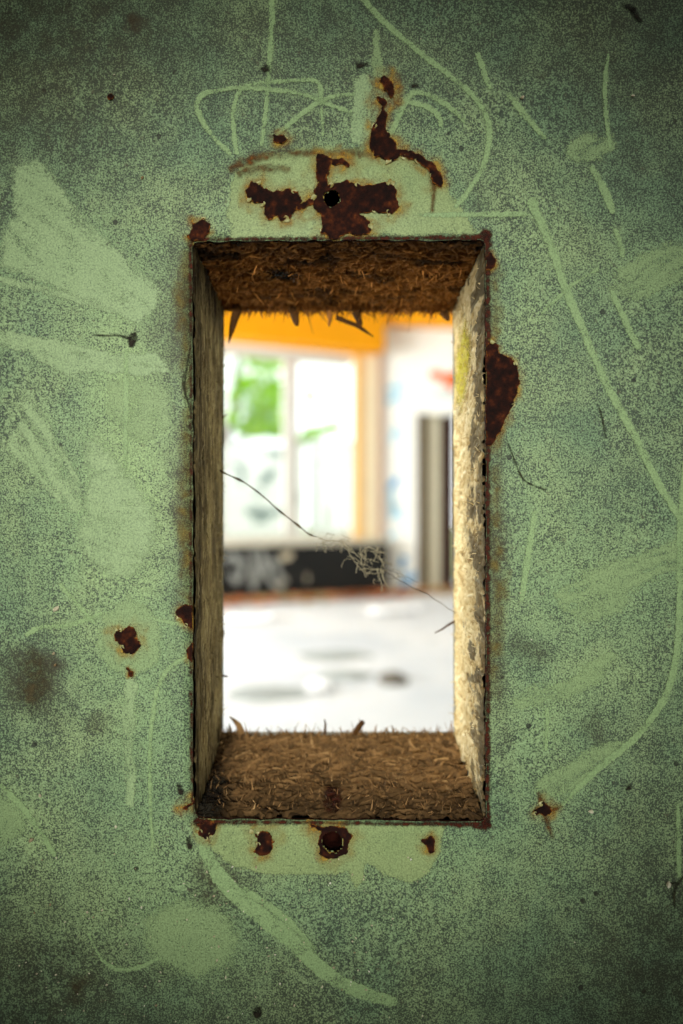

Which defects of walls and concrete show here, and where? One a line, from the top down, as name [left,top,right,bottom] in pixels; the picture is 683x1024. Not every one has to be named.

rust [175,69,521,861]
rust [114,626,141,677]
rust [532,796,558,834]